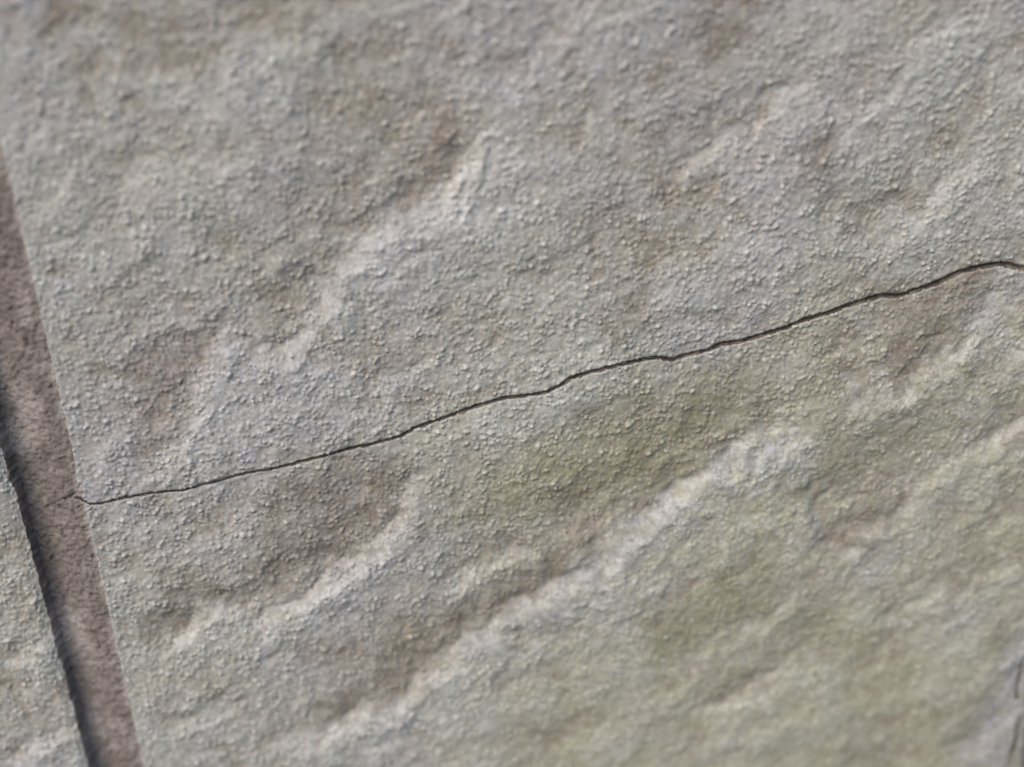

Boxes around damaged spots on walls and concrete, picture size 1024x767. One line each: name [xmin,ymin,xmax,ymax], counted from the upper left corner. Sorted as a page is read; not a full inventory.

crack [45,261,1024,508]